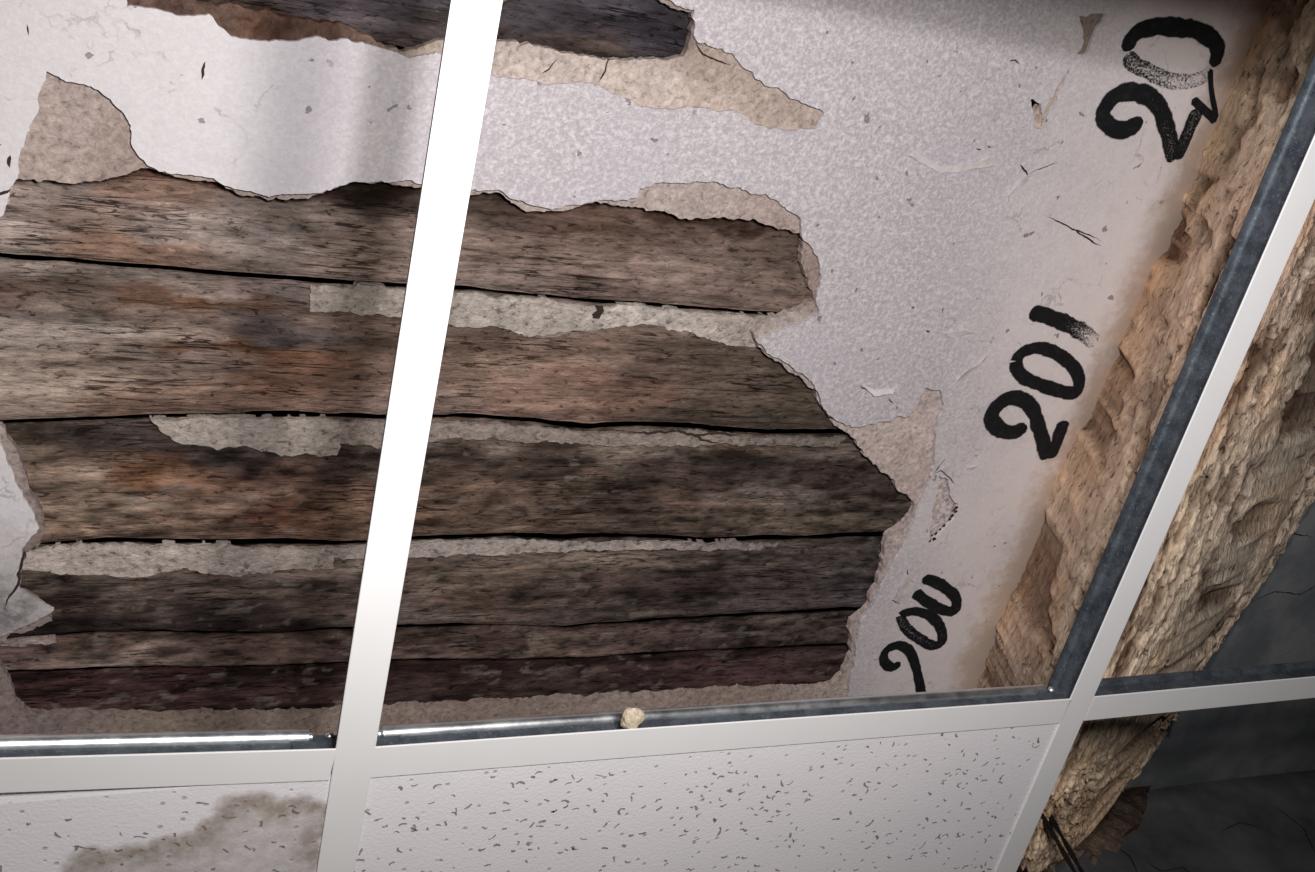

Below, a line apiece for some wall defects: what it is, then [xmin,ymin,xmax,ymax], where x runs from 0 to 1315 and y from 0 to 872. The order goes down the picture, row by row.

spalling [127,0,444,57]
spalling [490,0,823,130]
peeling [1078,13,1103,55]
spalling [0,72,347,219]
spalling [364,180,422,188]
spalling [309,280,405,317]
spalling [149,413,385,457]
spalling [379,181,989,729]
spalling [0,422,366,598]
spalling [0,613,341,736]
damp [71,796,326,869]
spalling [1017,785,1151,872]